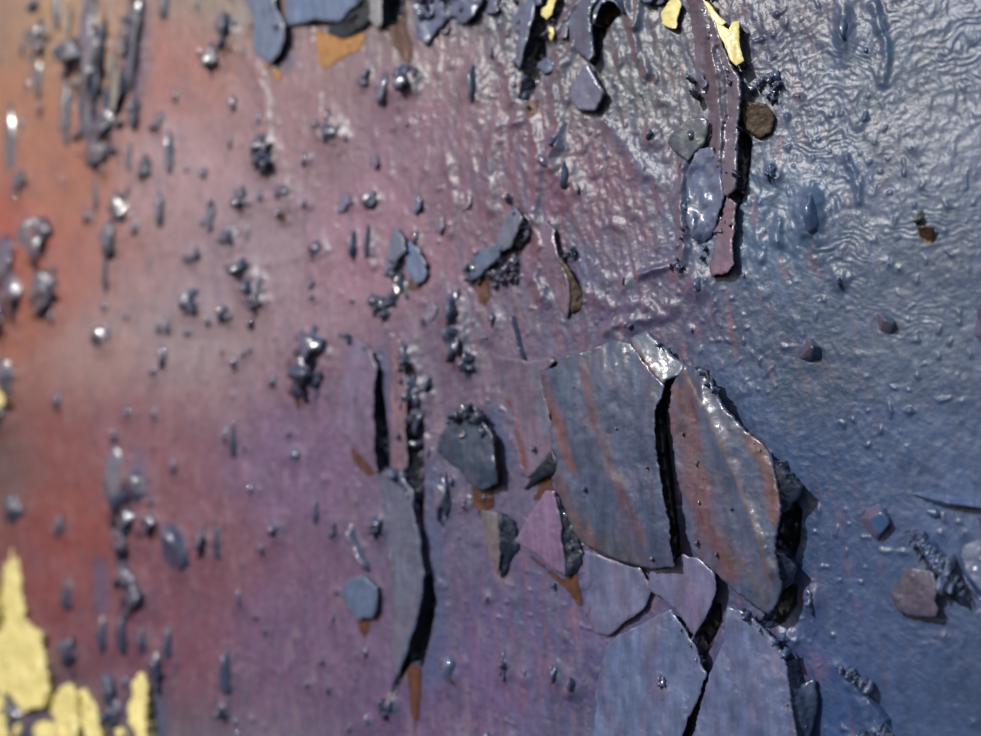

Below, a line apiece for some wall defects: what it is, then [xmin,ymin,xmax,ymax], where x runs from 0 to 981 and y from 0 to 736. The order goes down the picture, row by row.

peeling [246,0,393,68]
peeling [410,0,626,112]
peeling [668,0,784,277]
crack [733,131,752,212]
peeling [0,548,160,736]
crack [380,362,425,522]
crack [388,579,436,698]
rust [534,475,553,500]
rust [531,556,582,605]
peeling [481,330,819,736]
crack [659,378,681,554]
crack [683,602,722,736]